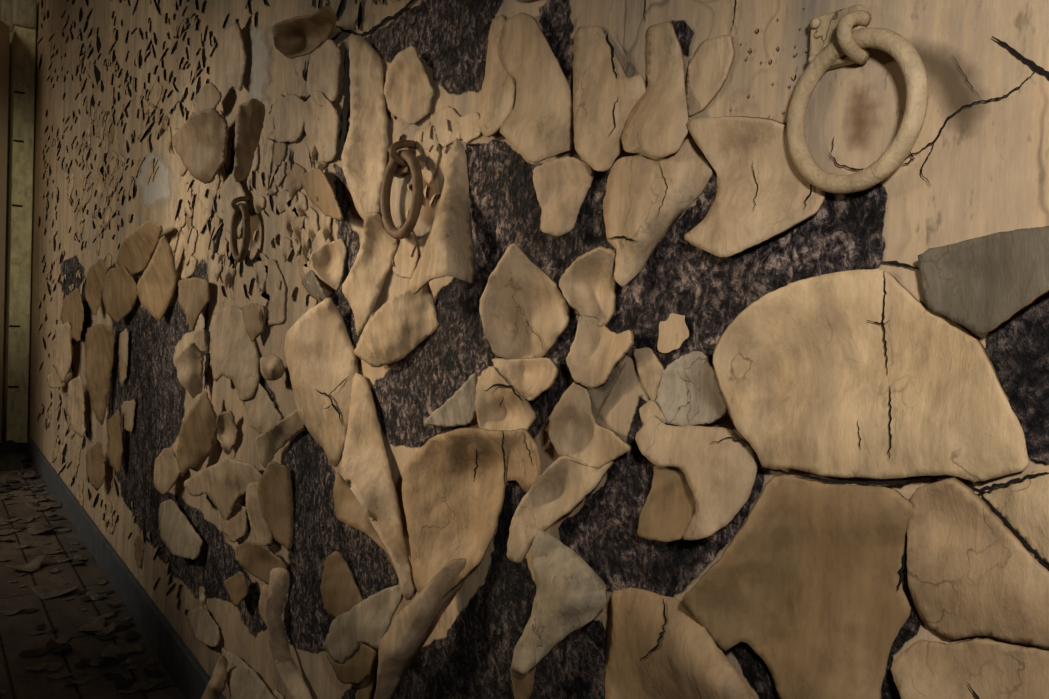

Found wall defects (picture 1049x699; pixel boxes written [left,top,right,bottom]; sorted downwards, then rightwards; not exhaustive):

peeling [41,0,145,255]
peeling [123,6,198,153]
peeling [149,0,181,24]
peeling [155,26,265,290]
peeling [221,0,256,91]
peeling [351,0,363,30]
crack [829,138,863,170]
crack [901,36,1049,186]
peeling [40,254,56,295]
peeling [51,435,71,474]